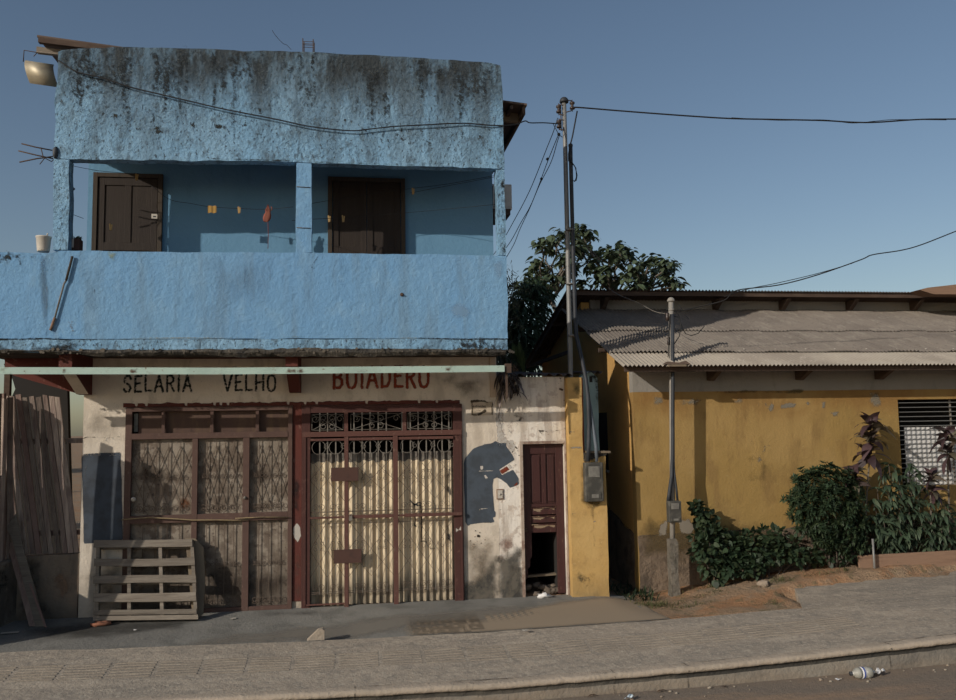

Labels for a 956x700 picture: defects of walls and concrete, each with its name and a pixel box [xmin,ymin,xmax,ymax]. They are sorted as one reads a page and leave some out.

water stain [65,48,140,129]
water stain [152,53,191,134]
water stain [211,53,252,130]
water stain [415,60,490,119]
spalling [0,347,515,358]
water stain [464,542,523,600]